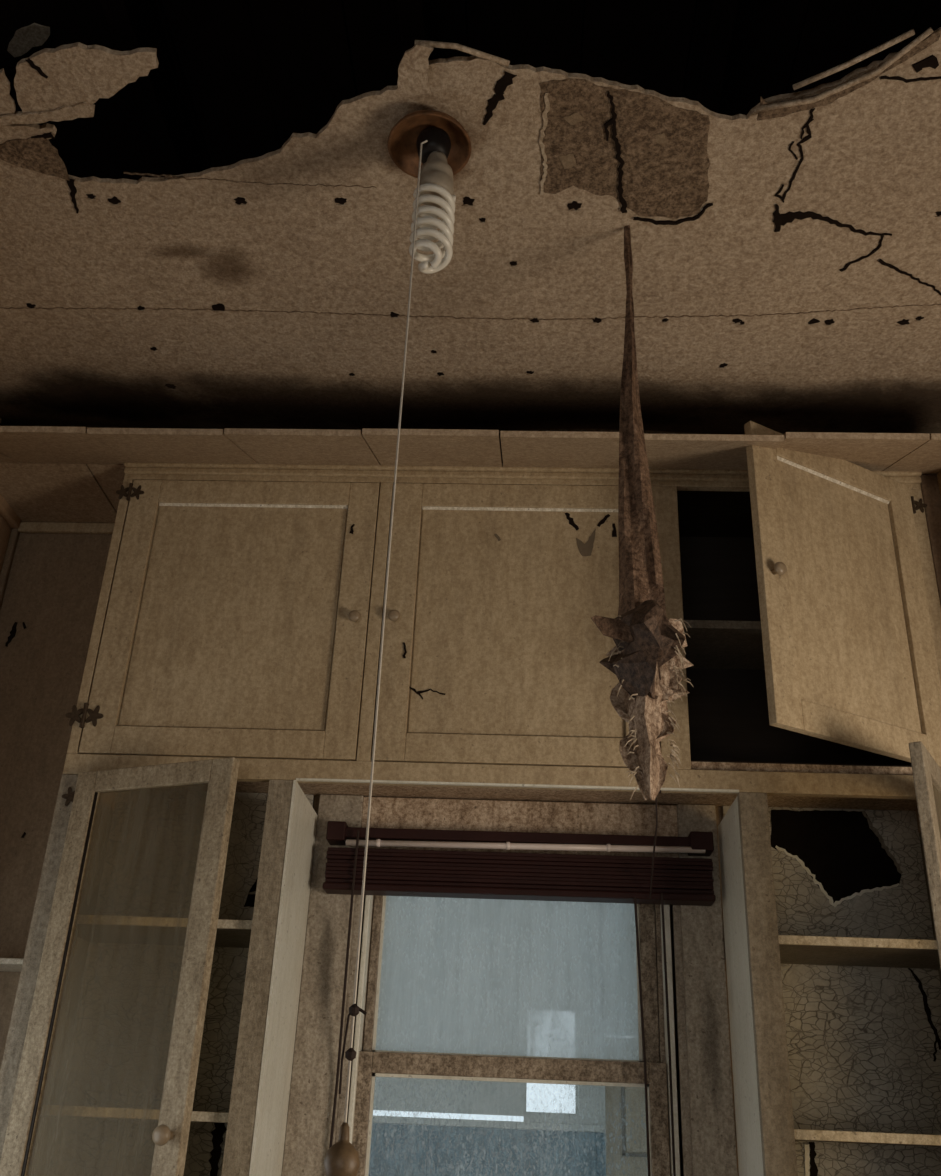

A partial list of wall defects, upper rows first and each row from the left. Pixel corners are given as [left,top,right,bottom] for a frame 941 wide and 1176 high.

crack [25,58,48,79]
crack [880,55,941,83]
crack [483,71,517,125]
peeling [539,78,713,225]
crack [0,92,941,320]
water stain [17,373,621,429]
water stain [639,384,941,433]
crack [908,968,941,1061]
crack [208,1123,227,1176]
crack [804,1142,818,1176]